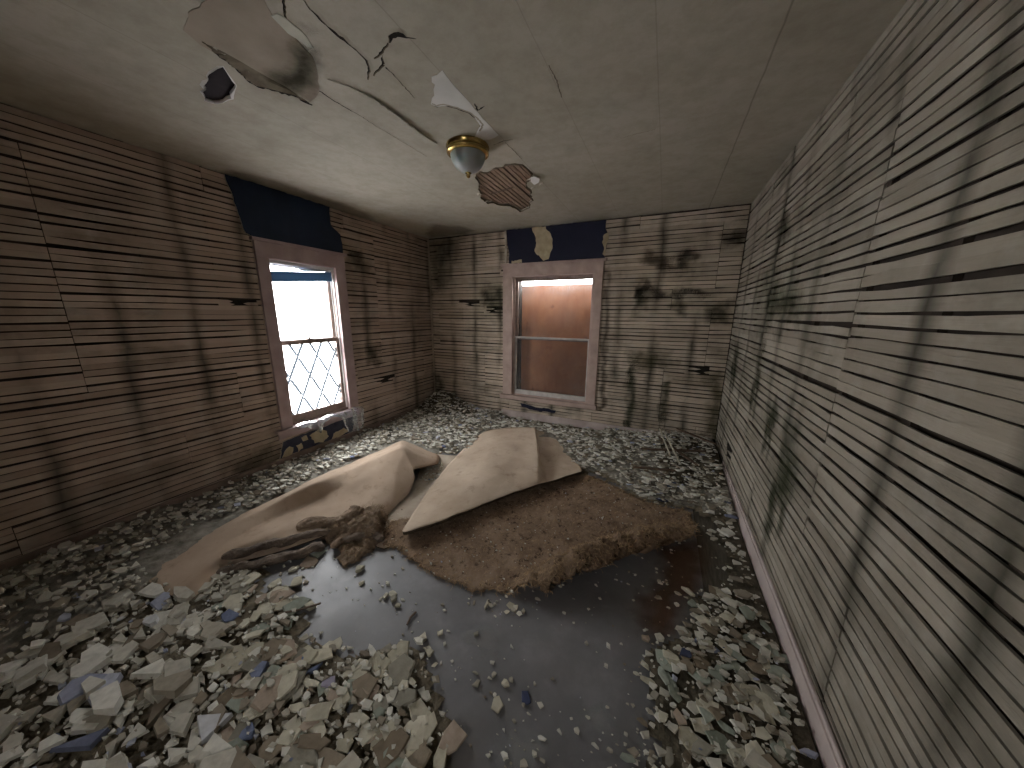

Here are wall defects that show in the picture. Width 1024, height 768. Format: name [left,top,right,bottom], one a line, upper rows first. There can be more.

peeling [183,0,320,105]
crack [282,0,523,159]
peeling [431,70,498,140]
flaking render [224,174,343,253]
spalling [475,163,543,212]
flaking render [505,220,609,264]
water stain [645,249,696,271]
water stain [636,286,705,314]
water stain [626,353,665,427]
flaking render [280,417,354,459]